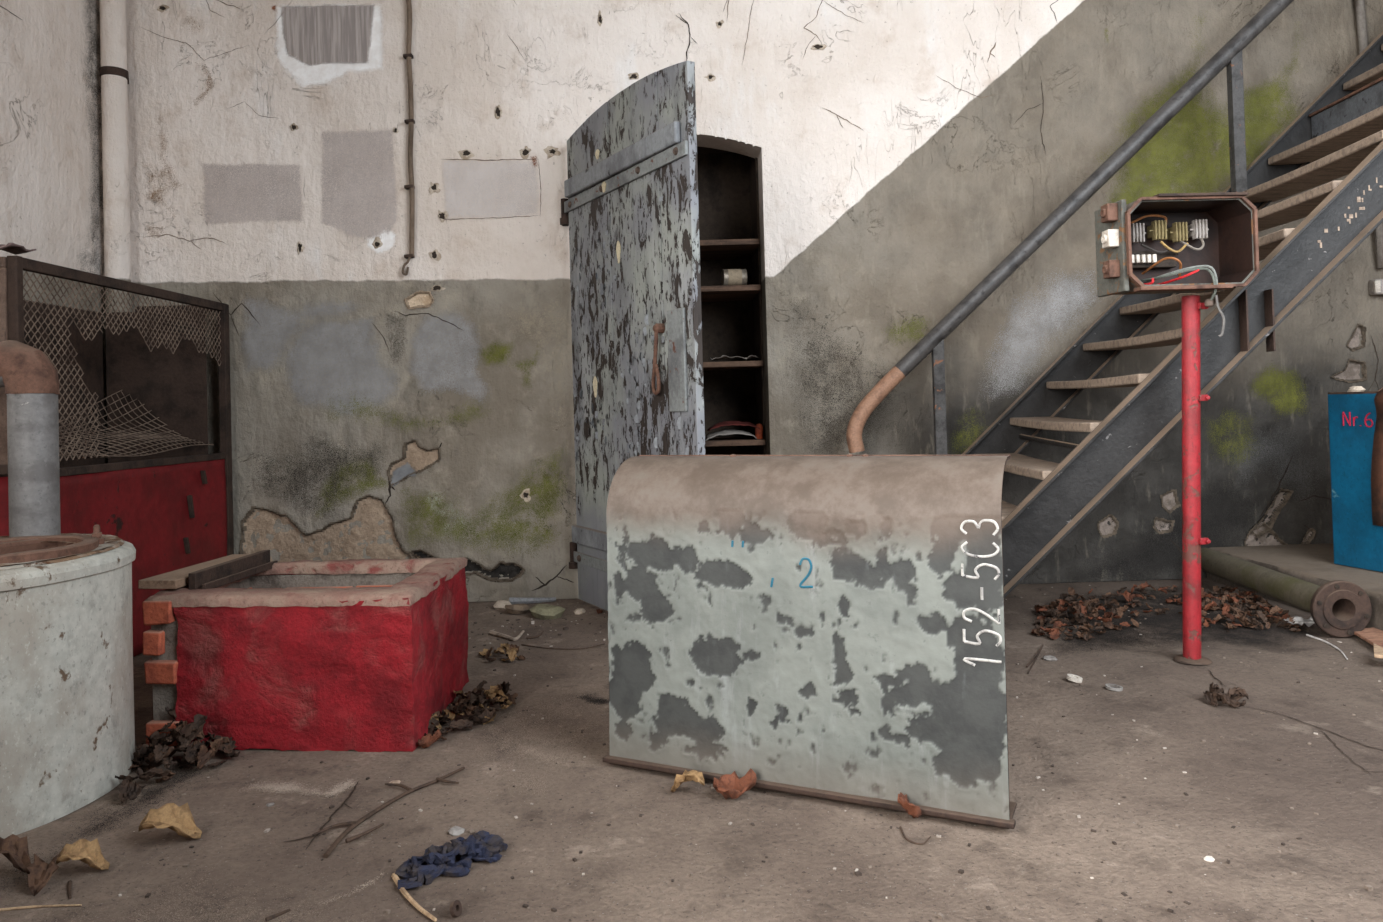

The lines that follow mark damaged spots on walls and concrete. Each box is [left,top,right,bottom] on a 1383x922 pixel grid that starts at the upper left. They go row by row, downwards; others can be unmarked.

water stain [245,430,386,524]
spalling [142,439,525,752]